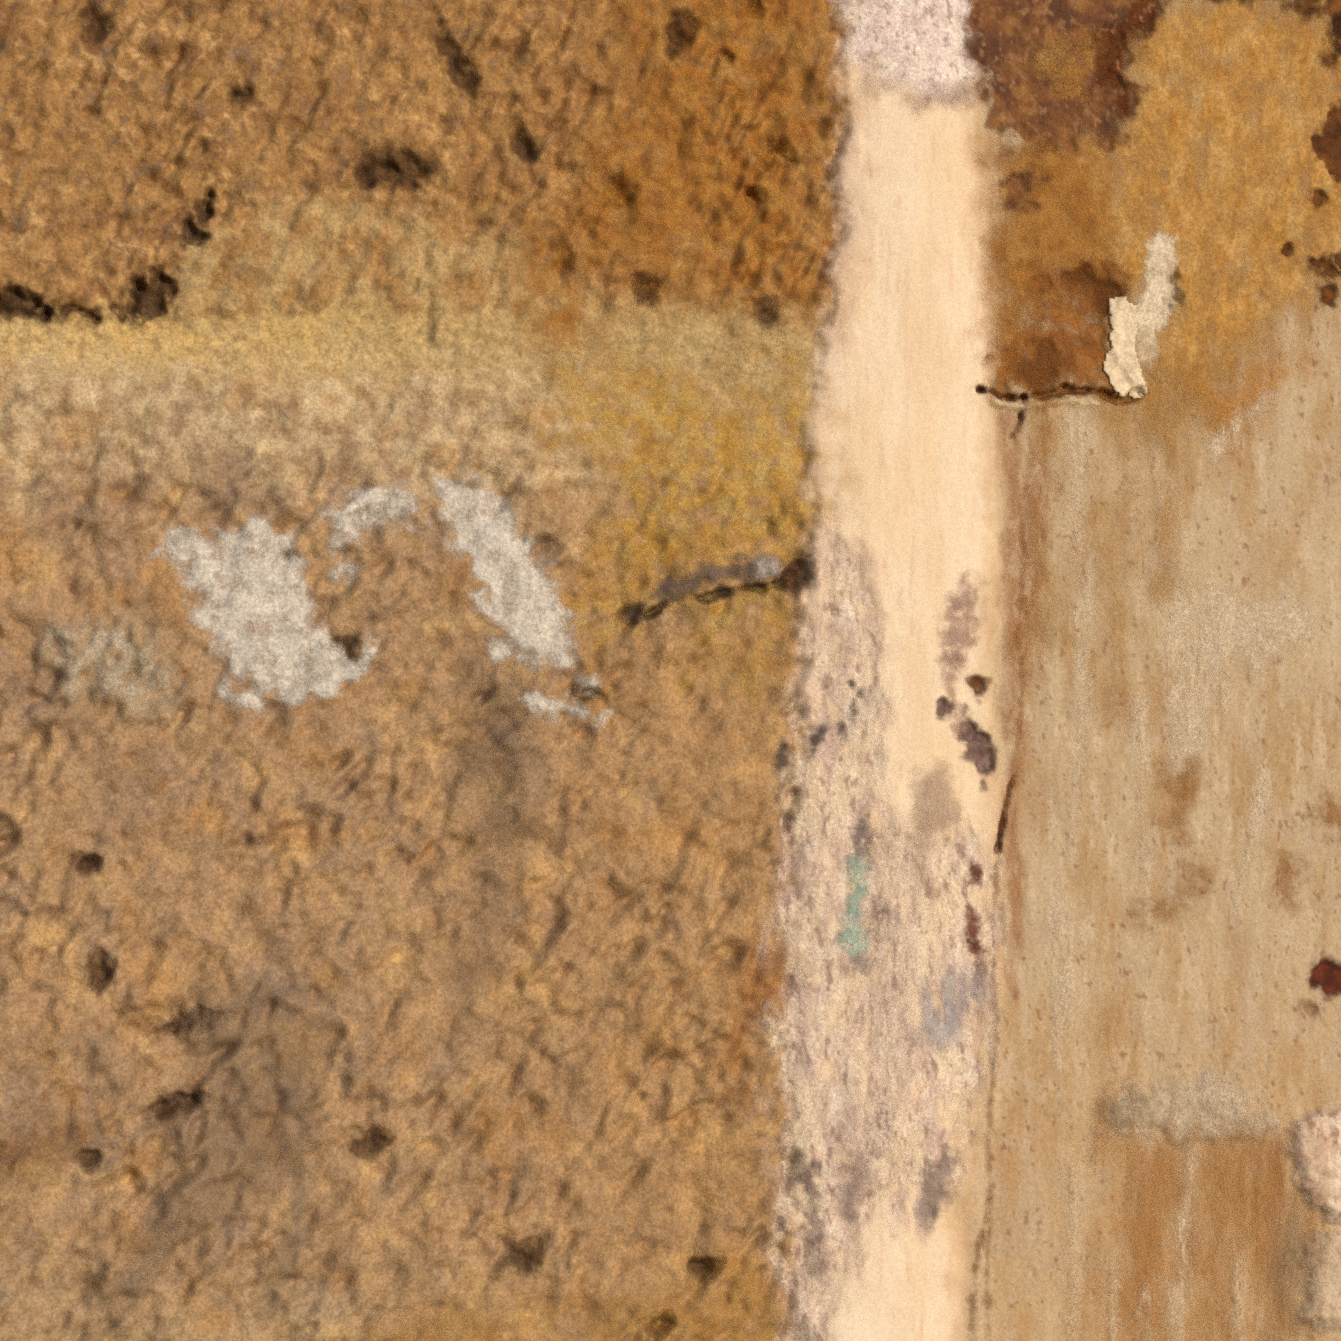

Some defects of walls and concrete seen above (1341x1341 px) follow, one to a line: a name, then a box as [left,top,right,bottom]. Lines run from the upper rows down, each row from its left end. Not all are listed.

spalling [1284,0,1341,67]
spalling [1311,107,1341,207]
spalling [840,0,1184,403]
leakage [992,0,1341,455]
spalling [1309,254,1341,307]
crack [976,383,1142,424]
peeling [152,530,193,561]
peeling [331,564,358,580]
crack [622,554,813,626]
peeling [489,638,513,661]
peeling [579,677,598,691]
leakage [1160,487,1225,824]